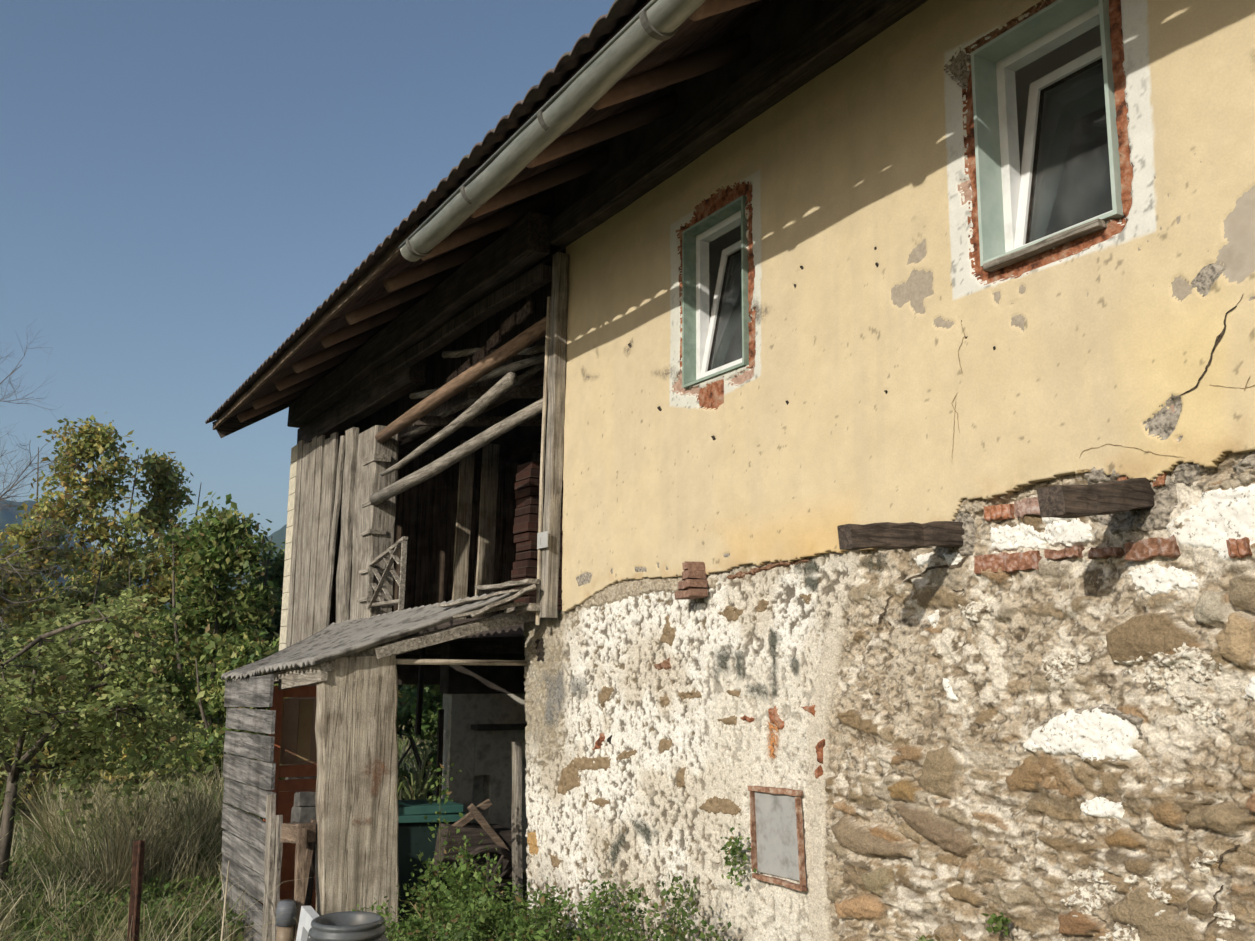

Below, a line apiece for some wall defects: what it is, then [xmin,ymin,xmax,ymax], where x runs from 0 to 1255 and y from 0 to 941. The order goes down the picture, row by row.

peeling [891,238,962,329]
spalling [1169,250,1225,302]
crack [1181,293,1255,395]
spalling [671,365,755,410]
spalling [1142,394,1183,442]
flaking render [914,452,1255,596]
peeling [1114,641,1227,729]
peeling [1023,704,1141,761]
spalling [815,739,825,779]
peeling [1080,797,1125,821]
peeling [1060,866,1174,917]
peeling [1097,922,1140,941]